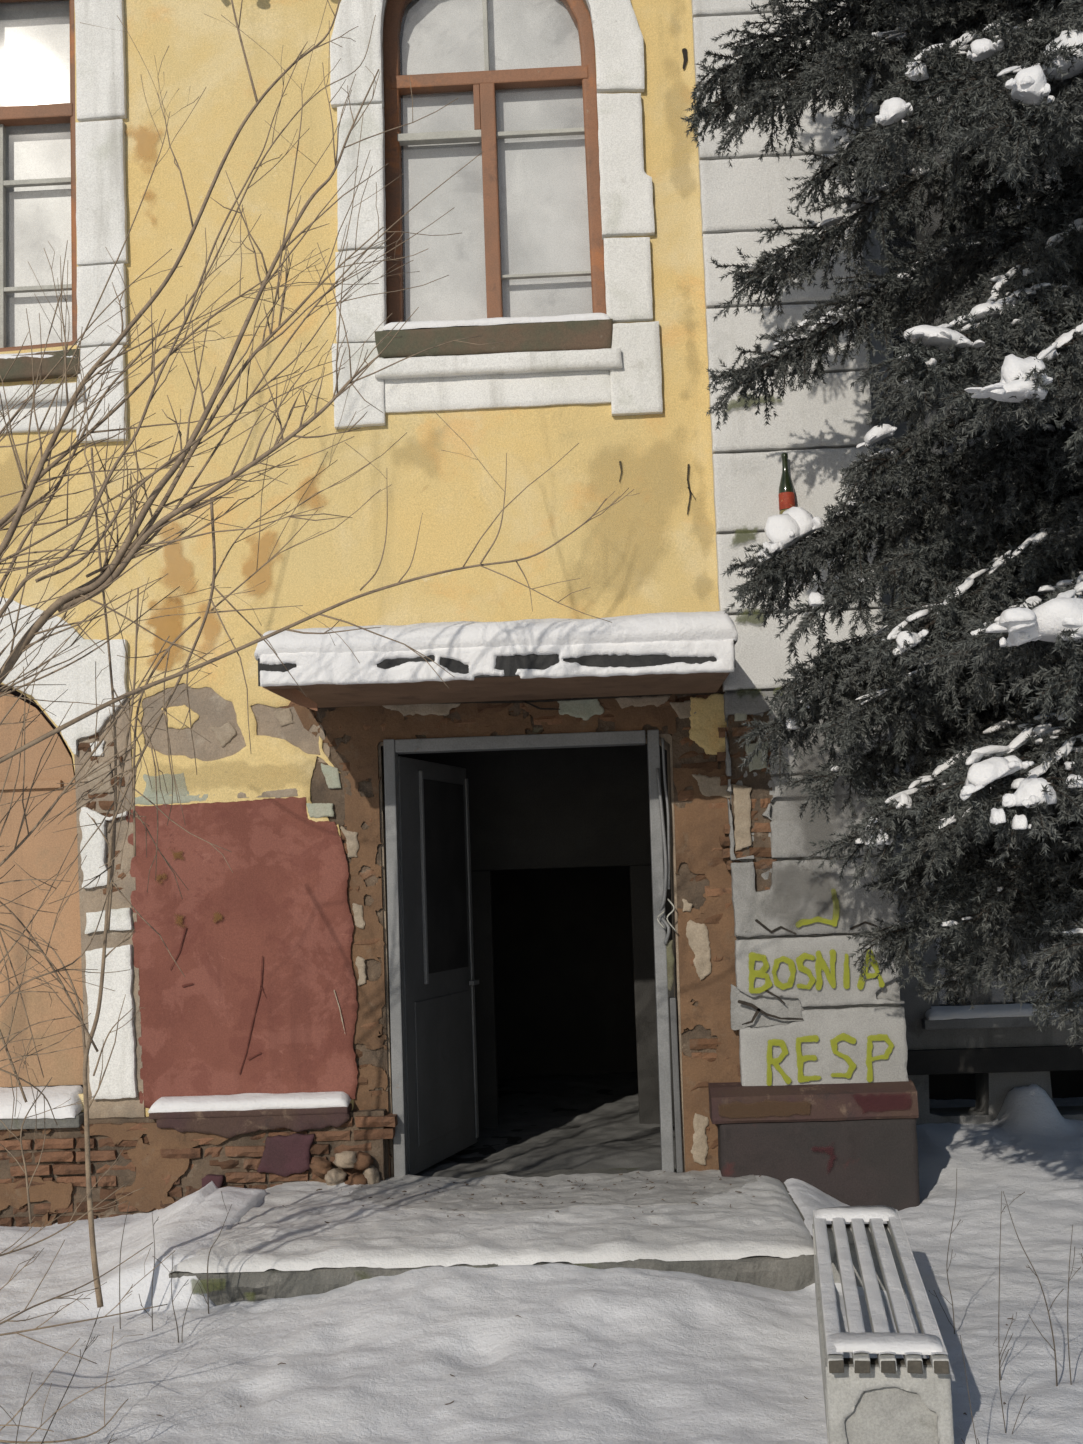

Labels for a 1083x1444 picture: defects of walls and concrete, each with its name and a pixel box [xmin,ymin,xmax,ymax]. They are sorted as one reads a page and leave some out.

flaking render [0,683,802,1227]